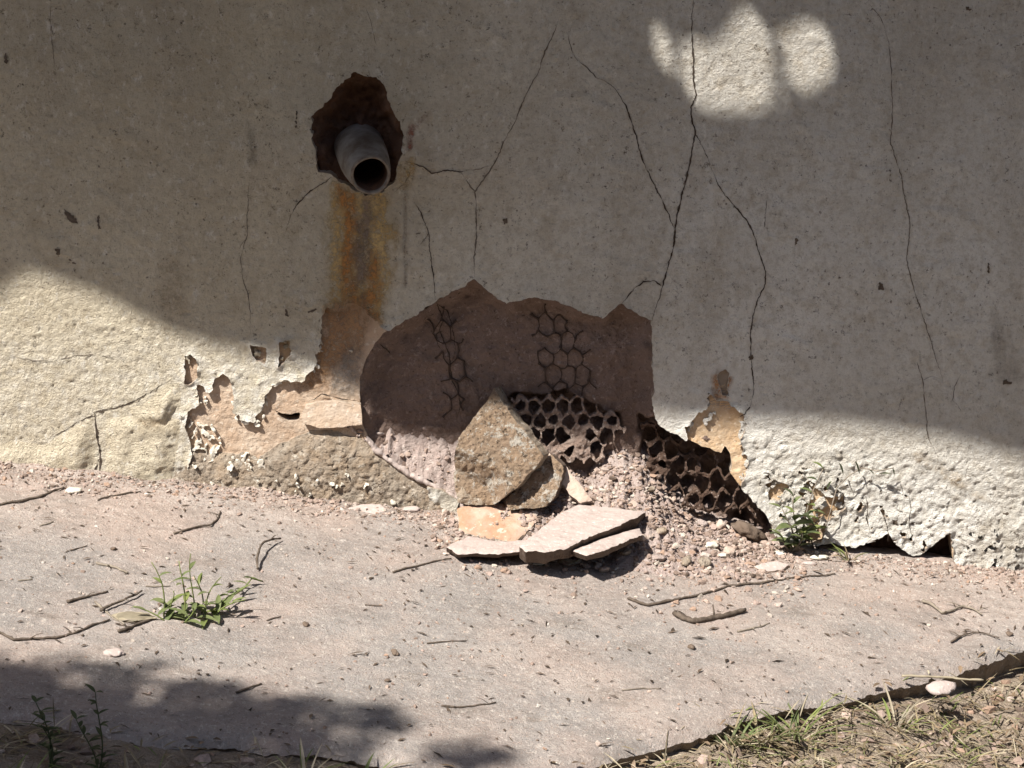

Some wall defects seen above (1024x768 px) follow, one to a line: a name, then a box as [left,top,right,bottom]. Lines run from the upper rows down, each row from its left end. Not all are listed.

crack [286,177,331,230]
spalling [311,72,404,186]
crack [395,1,767,417]
crack [870,5,961,453]
flaking render [173,279,872,541]
peeling [880,488,926,546]